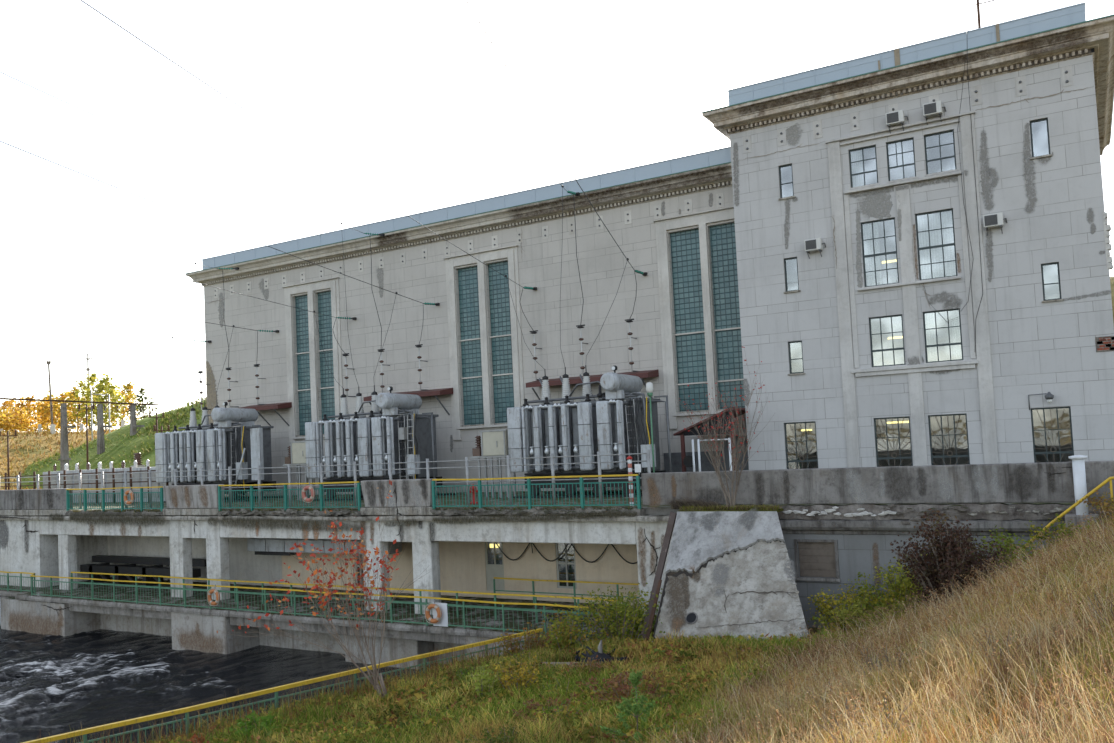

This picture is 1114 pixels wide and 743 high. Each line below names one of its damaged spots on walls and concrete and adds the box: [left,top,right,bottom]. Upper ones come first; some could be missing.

damp [980,132,998,210]
damp [1023,123,1053,213]
damp [784,198,797,249]
damp [850,170,967,287]
damp [929,292,960,309]
spalling [1095,336,1114,352]
crack [642,529,785,638]
crack [695,591,805,628]